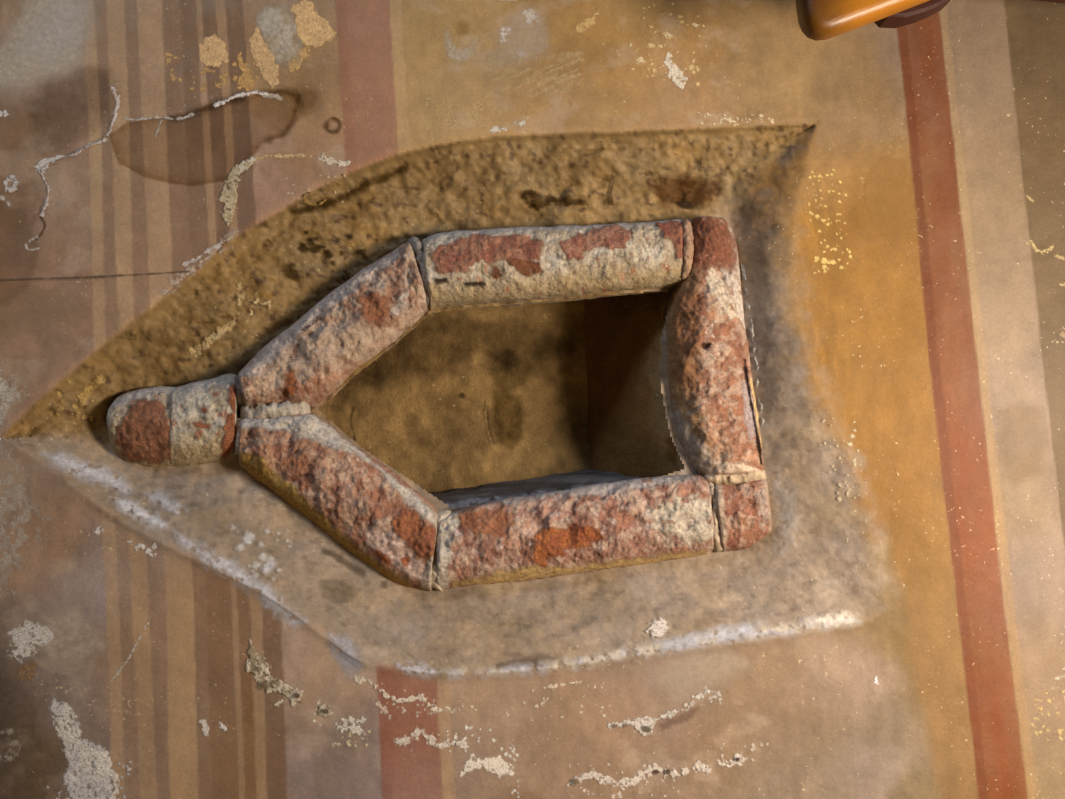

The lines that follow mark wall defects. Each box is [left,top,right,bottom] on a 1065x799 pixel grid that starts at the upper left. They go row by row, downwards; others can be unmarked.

peeling [165,0,336,91]
peeling [629,2,707,89]
peeling [0,175,19,206]
crack [25,86,283,251]
peeling [219,153,350,226]
leakage [0,356,20,425]
crack [744,359,763,465]